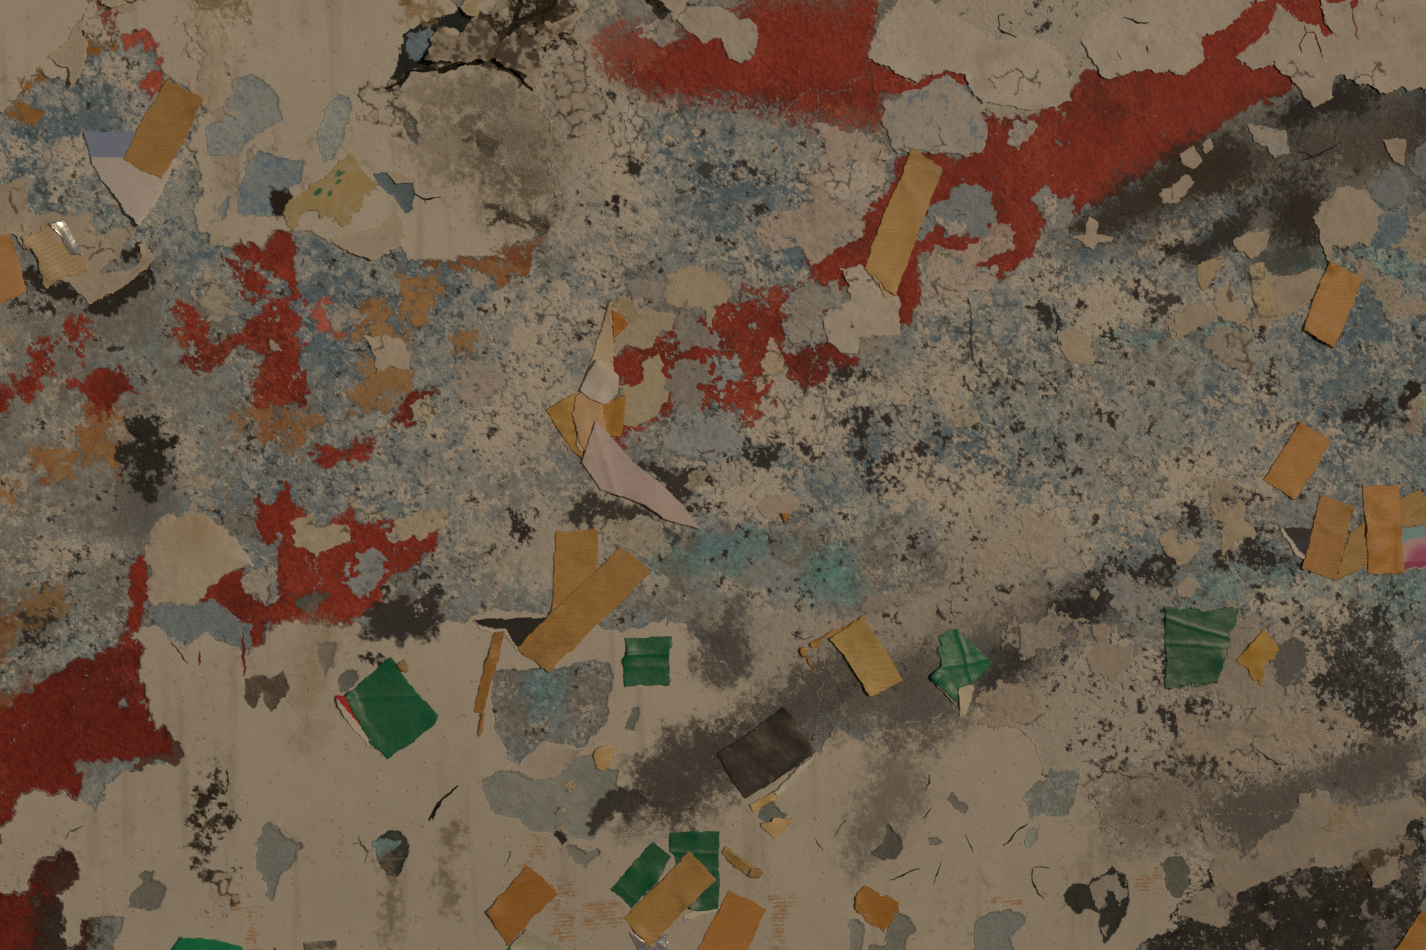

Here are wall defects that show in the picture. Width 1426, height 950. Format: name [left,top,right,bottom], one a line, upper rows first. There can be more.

crack [1117,17,1149,59]
crack [1299,27,1323,58]
peeling [205,74,283,157]
peeling [316,94,352,162]
peeling [462,132,536,175]
peeling [218,150,305,221]
peeling [373,171,416,213]
peeling [341,547,389,599]
peeling [0,667,184,827]
peeling [0,849,167,950]
peeling [974,909,1026,950]